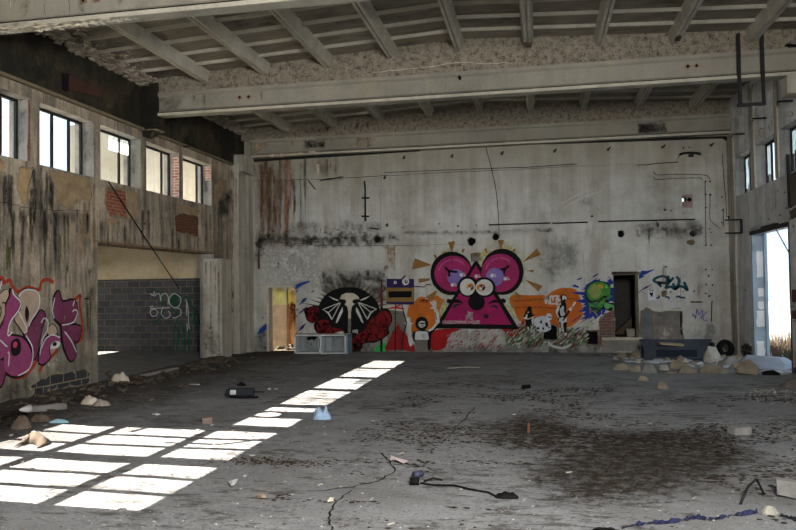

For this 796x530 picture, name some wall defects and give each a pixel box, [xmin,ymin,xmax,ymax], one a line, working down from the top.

spalling [0,16,160,87]
spalling [202,115,252,135]
water stain [3,169,109,268]
spalling [49,171,91,209]
spalling [104,186,138,221]
spalling [174,213,199,238]
water stain [637,222,702,237]
crack [289,453,396,530]